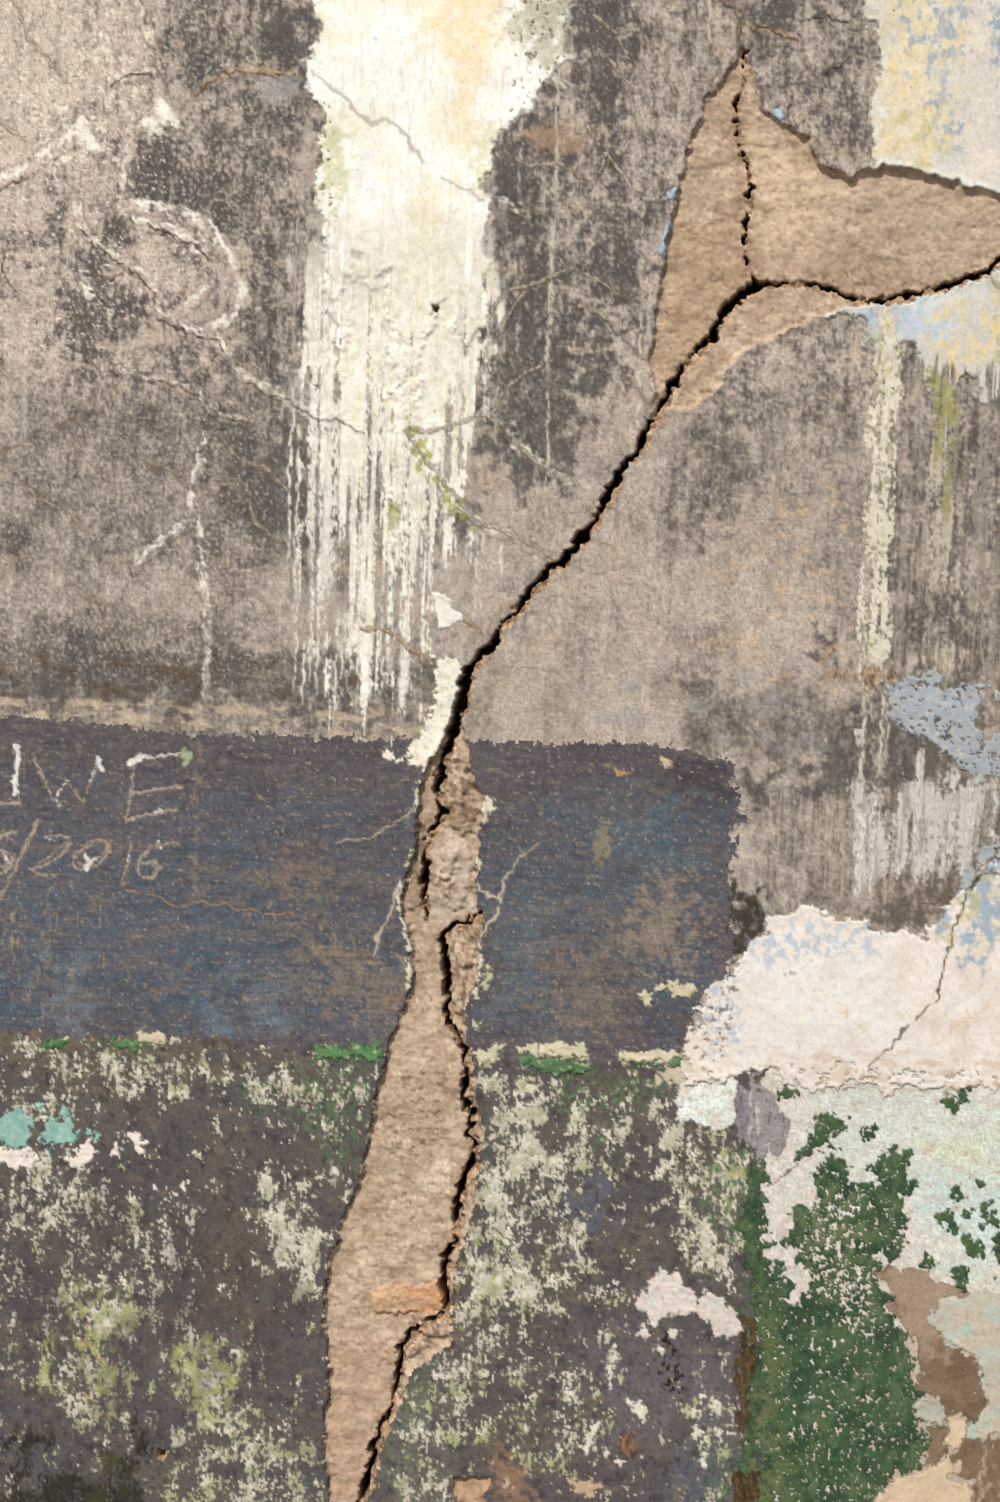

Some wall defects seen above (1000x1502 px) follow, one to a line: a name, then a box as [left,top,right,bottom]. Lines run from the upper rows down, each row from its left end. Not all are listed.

crack [126,889,316,916]
crack [109,370,357,539]
crack [312,71,423,163]
peeling [302,0,575,396]
spalling [314,655,593,1502]
damp [533,392,550,539]
damp [545,224,556,365]
crack [346,0,1000,1502]
peeling [618,834,1000,1502]
spalling [648,0,1000,453]
damp [841,306,1000,901]
damp [1,1417,154,1502]